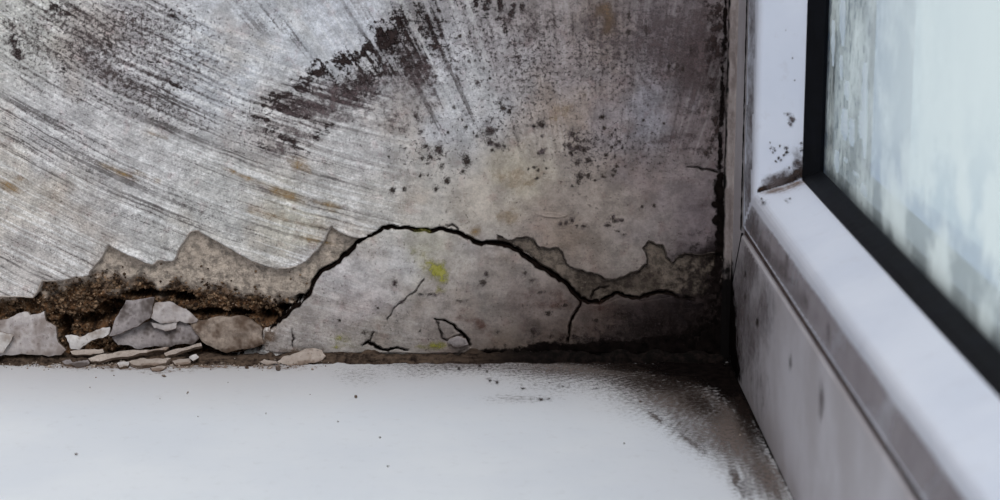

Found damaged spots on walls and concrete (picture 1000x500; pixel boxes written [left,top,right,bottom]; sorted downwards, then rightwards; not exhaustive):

flaking render [0,223,367,354]
leakage [1,0,769,461]
crack [270,224,693,351]
peeling [496,234,723,300]